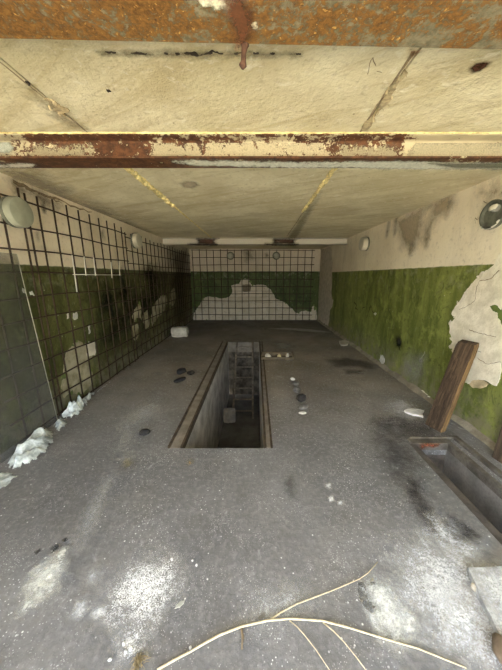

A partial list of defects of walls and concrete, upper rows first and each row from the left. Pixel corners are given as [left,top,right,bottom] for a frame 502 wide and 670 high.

rust [224,0,253,70]
crack [0,62,45,98]
crack [360,51,415,132]
leakage [395,213,420,250]
peeling [132,288,175,340]
peeling [193,247,333,326]
peeling [449,253,502,389]